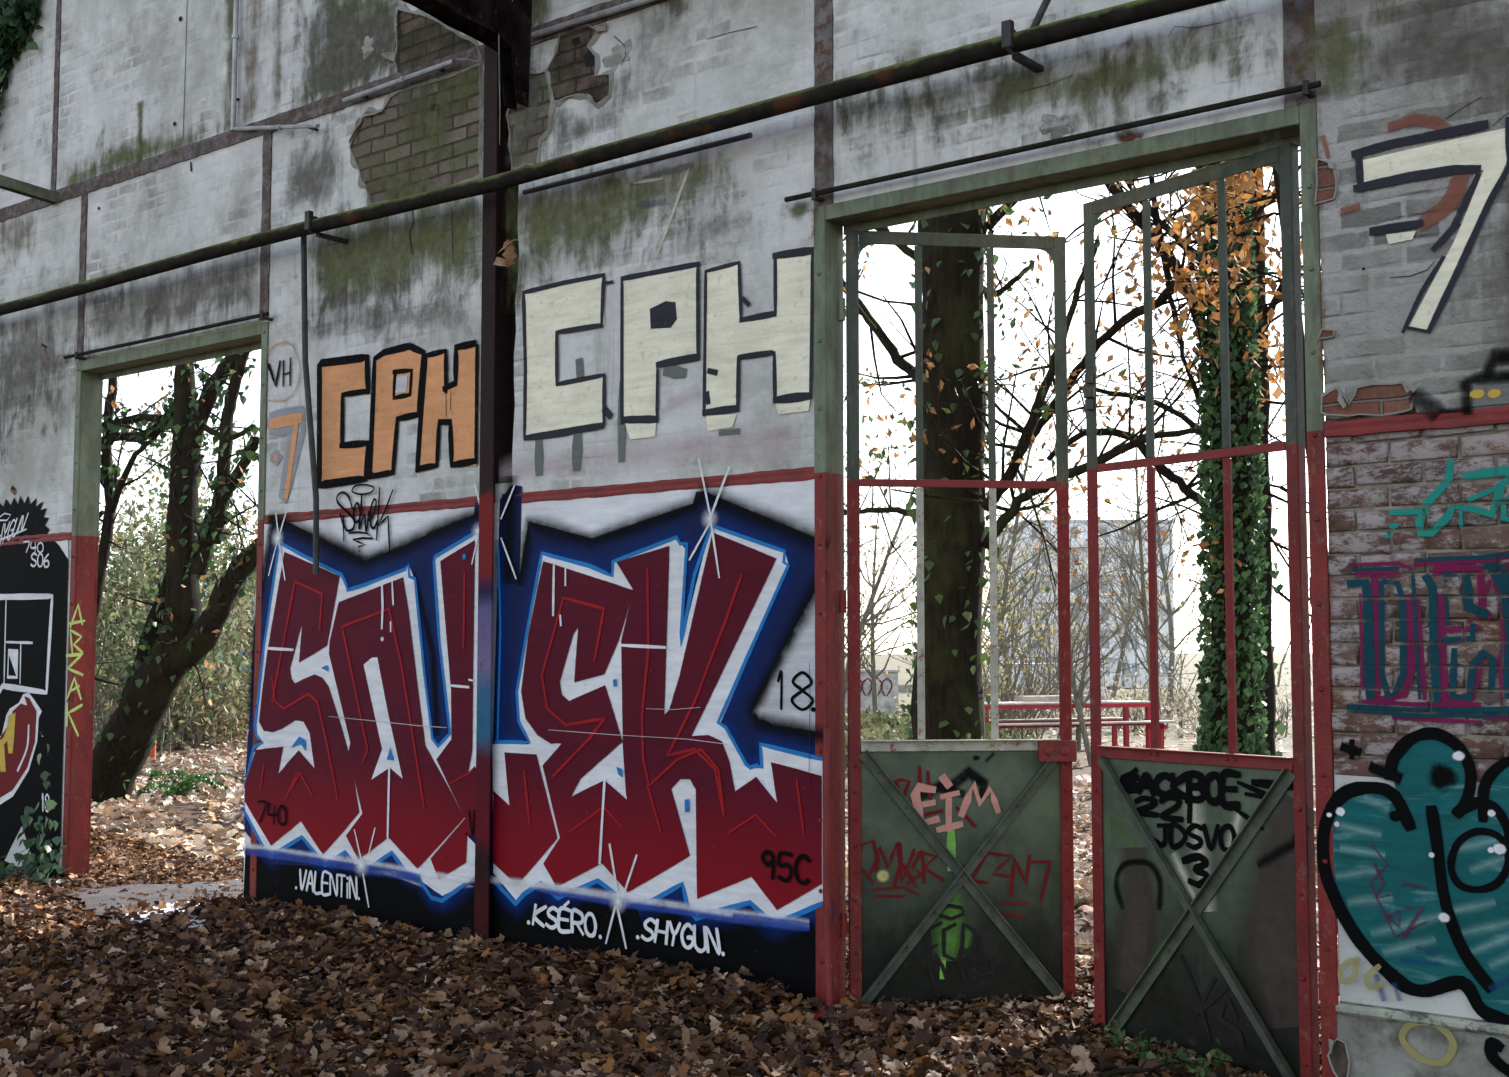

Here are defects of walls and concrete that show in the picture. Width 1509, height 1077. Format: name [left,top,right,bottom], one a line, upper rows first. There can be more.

water stain [290,141,335,203]
water stain [297,0,391,91]
spalling [349,5,484,206]
spalling [505,22,615,170]
water stain [317,286,461,333]
flaking render [1314,0,1509,782]